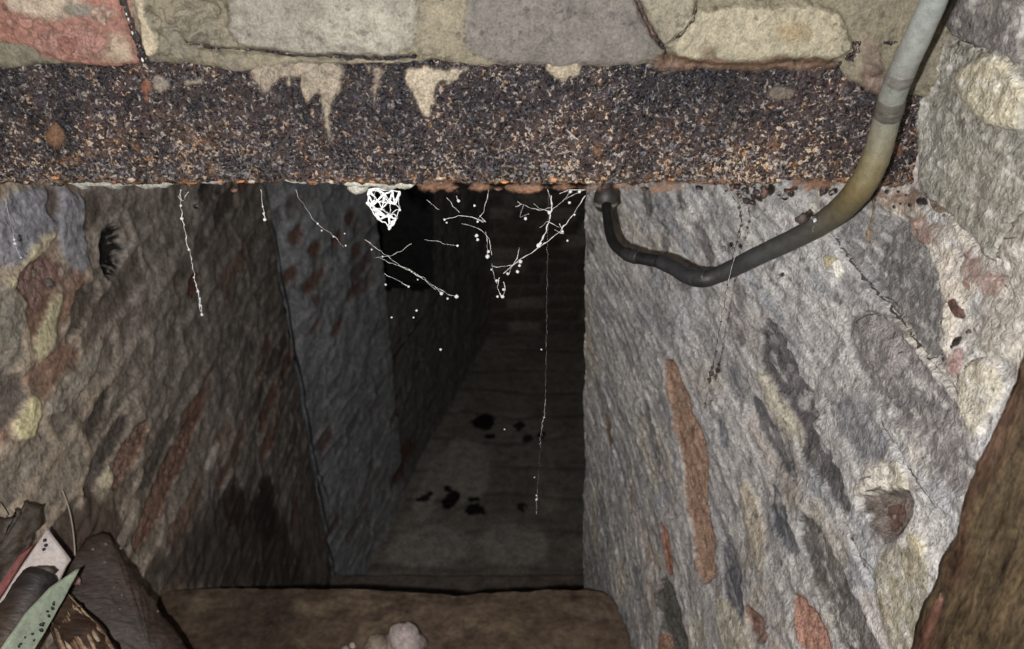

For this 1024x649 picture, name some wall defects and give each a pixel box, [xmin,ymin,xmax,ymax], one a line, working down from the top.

rust [653,49,837,71]
rust [47,124,64,147]
rust [214,179,256,193]
rust [422,176,457,192]
rust [471,177,593,194]
rust [614,178,714,193]
rust [729,175,832,206]
crack [830,233,984,509]
water stain [470,414,496,439]
water stain [416,486,485,515]